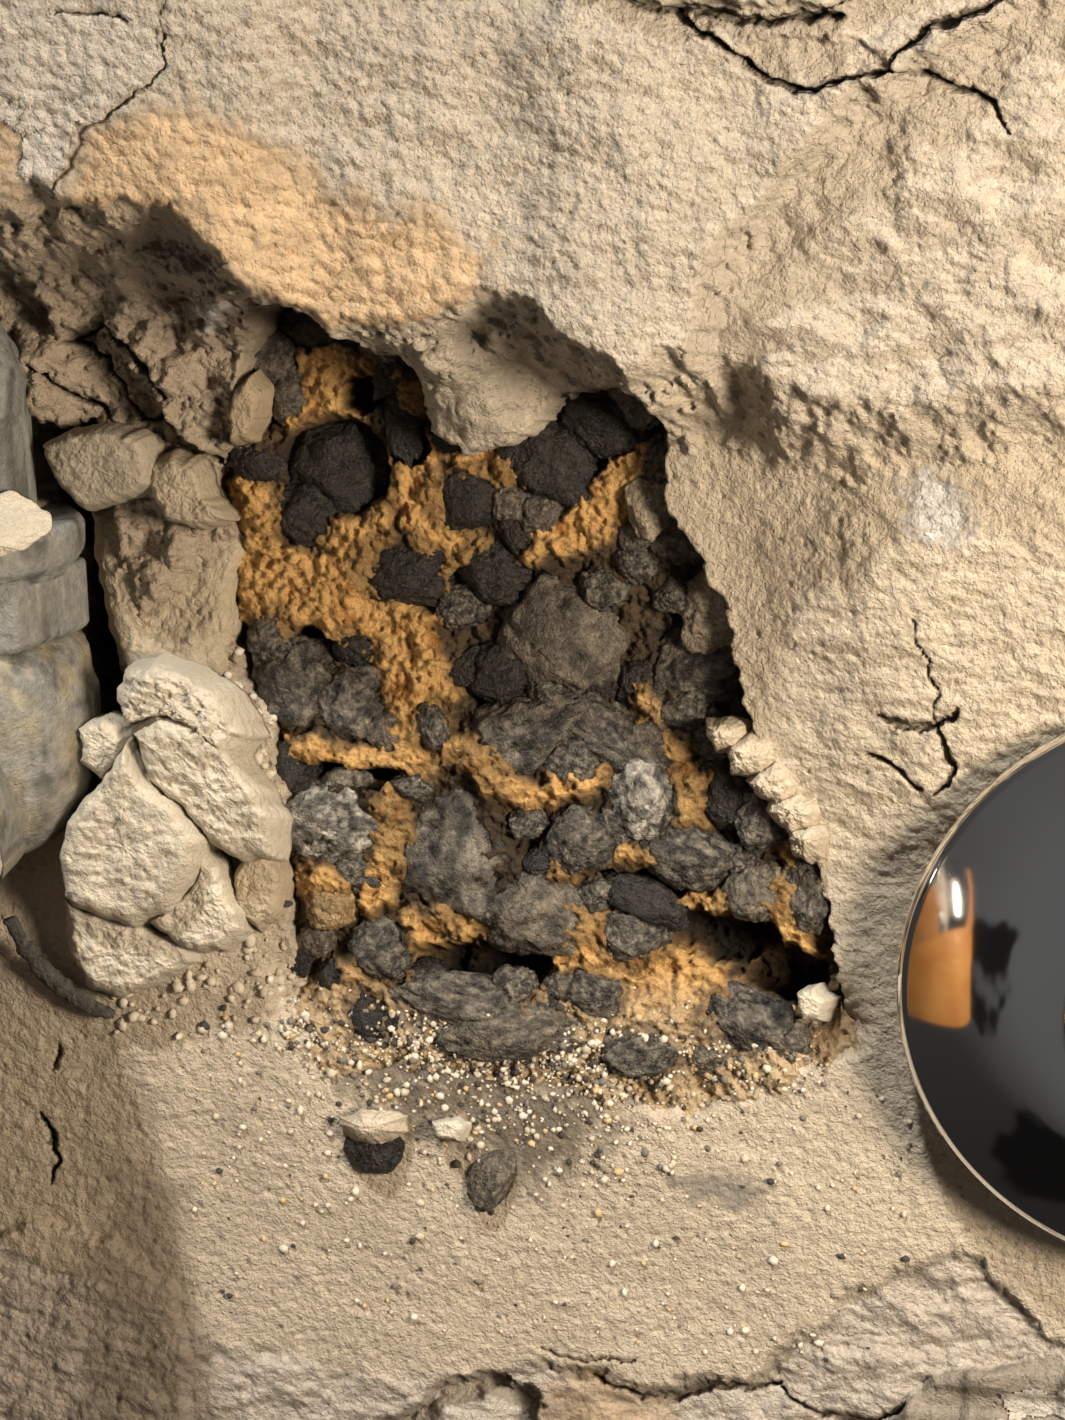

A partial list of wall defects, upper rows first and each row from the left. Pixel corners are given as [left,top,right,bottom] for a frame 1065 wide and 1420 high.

crack [628,0,1004,122]
spalling [0,0,859,1124]
crack [865,634,959,794]
crack [541,1349,904,1420]